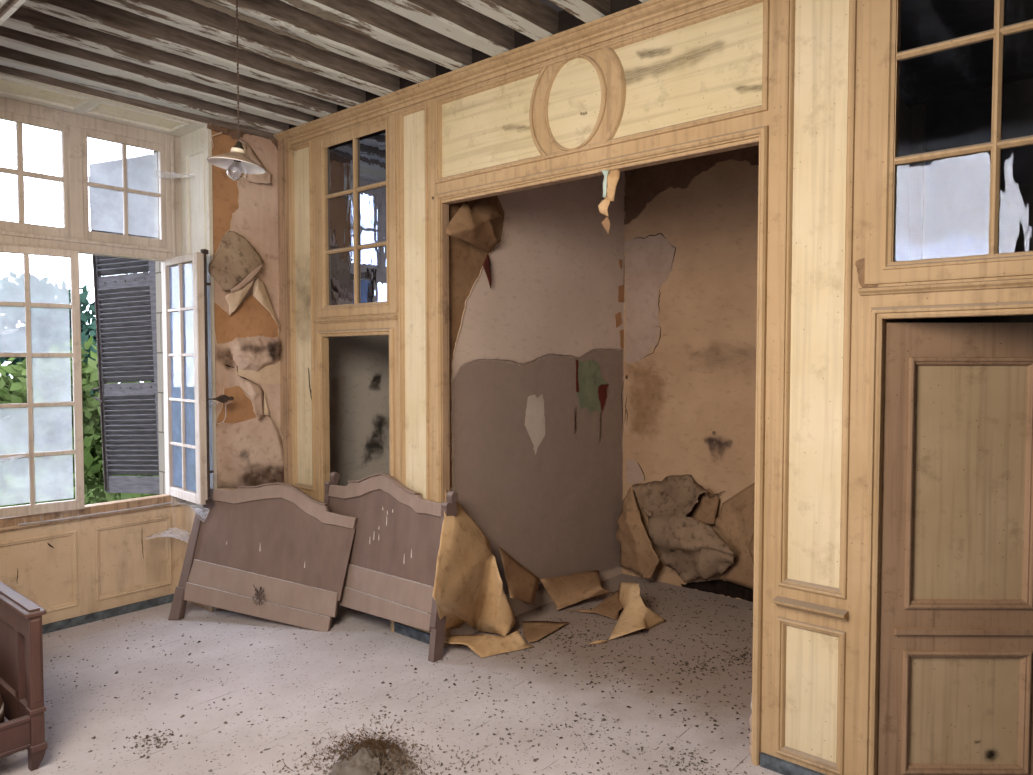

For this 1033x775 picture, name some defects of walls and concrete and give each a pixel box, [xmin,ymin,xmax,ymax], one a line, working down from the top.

peeling [192,0,330,52]
peeling [285,0,350,24]
peeling [624,145,759,225]
peeling [207,123,280,344]
peeling [446,196,503,252]
peeling [615,285,624,348]
peeling [216,376,269,427]
peeling [598,384,609,411]
damp [707,432,728,449]